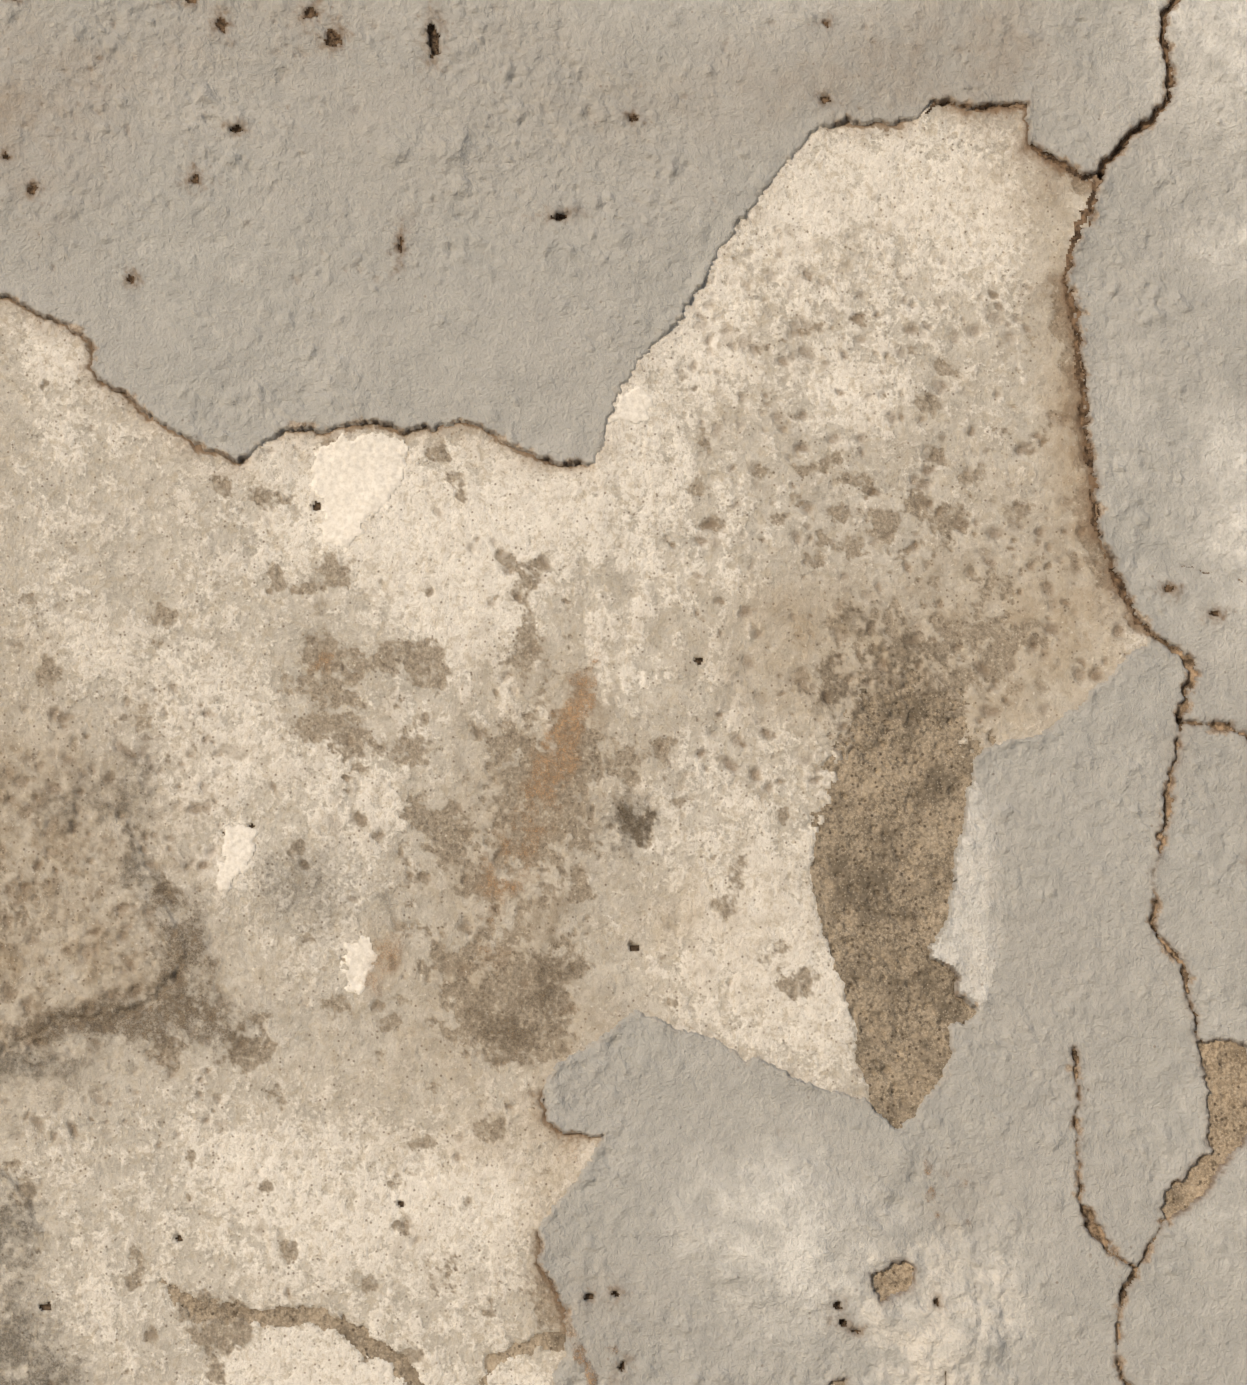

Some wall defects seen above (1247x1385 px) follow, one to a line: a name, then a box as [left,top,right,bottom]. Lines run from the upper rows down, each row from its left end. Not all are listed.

crack [925,101,1027,114]
peeling [608,386,656,425]
crack [1030,0,1247,854]
peeling [309,432,408,550]
peeling [216,825,258,893]
spalling [810,669,983,1129]
peeling [930,781,1009,1008]
peeling [340,936,378,995]
crack [1149,900,1203,1043]
crack [1072,1047,1170,1385]
spalling [167,1284,425,1385]
peeling [477,1332,567,1385]